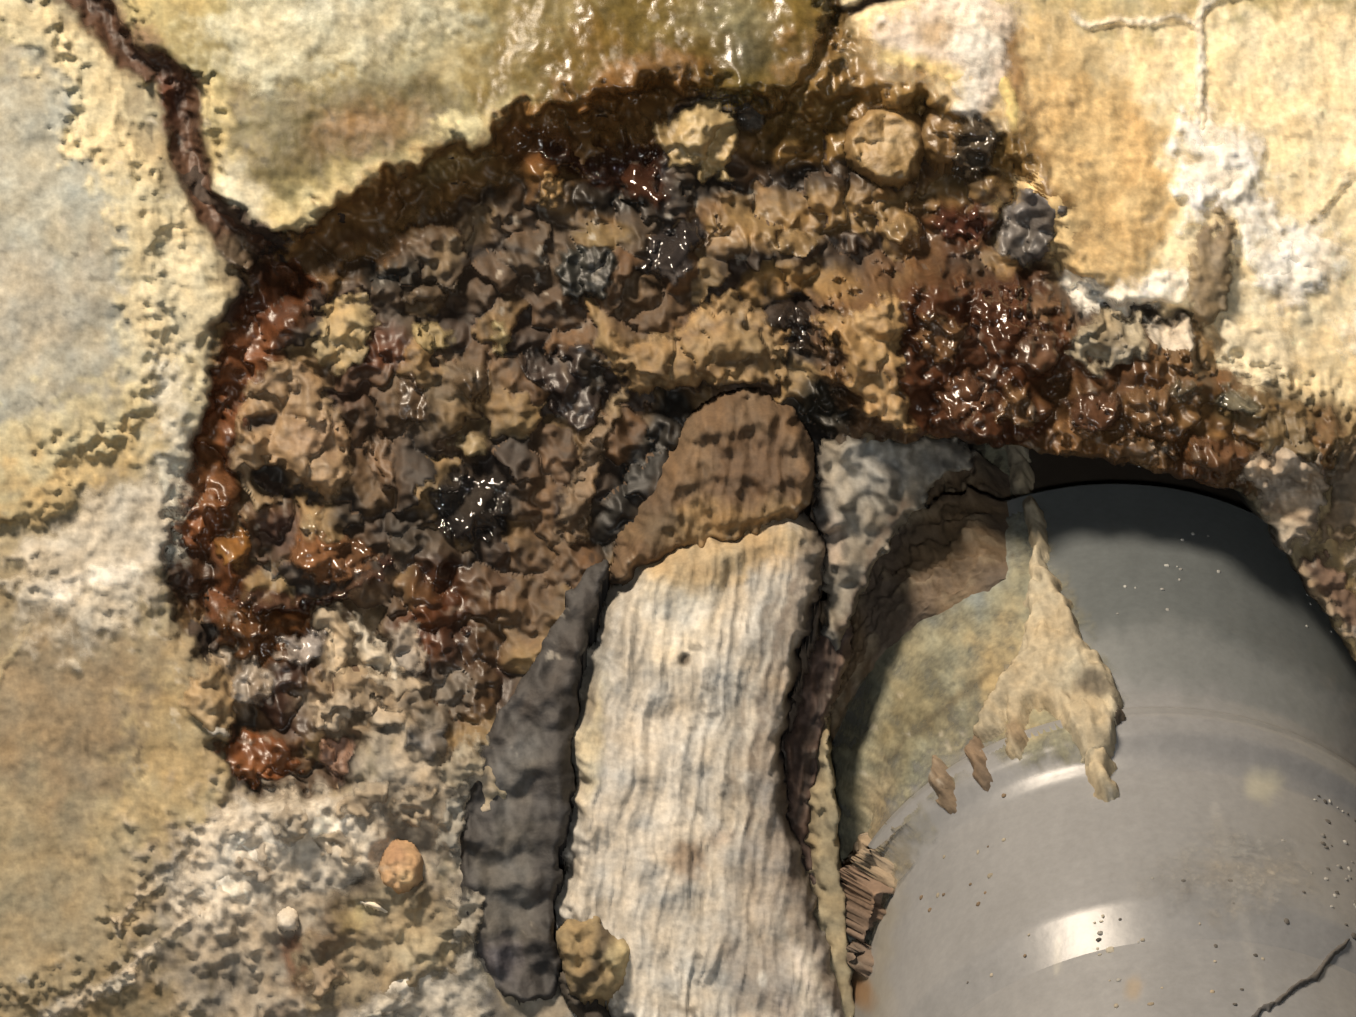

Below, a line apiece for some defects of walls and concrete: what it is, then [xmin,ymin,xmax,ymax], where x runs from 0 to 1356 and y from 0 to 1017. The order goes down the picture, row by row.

peeling [206,0,476,92]
crack [793,0,884,64]
crack [65,0,345,327]
corrosion [174,43,694,665]
corrosion [1040,372,1216,466]
spalling [164,86,1356,883]
crack [39,906,206,1017]
crack [111,869,181,925]
efflorescence [167,785,384,931]
spalling [277,839,485,1016]
damp [363,953,507,1017]